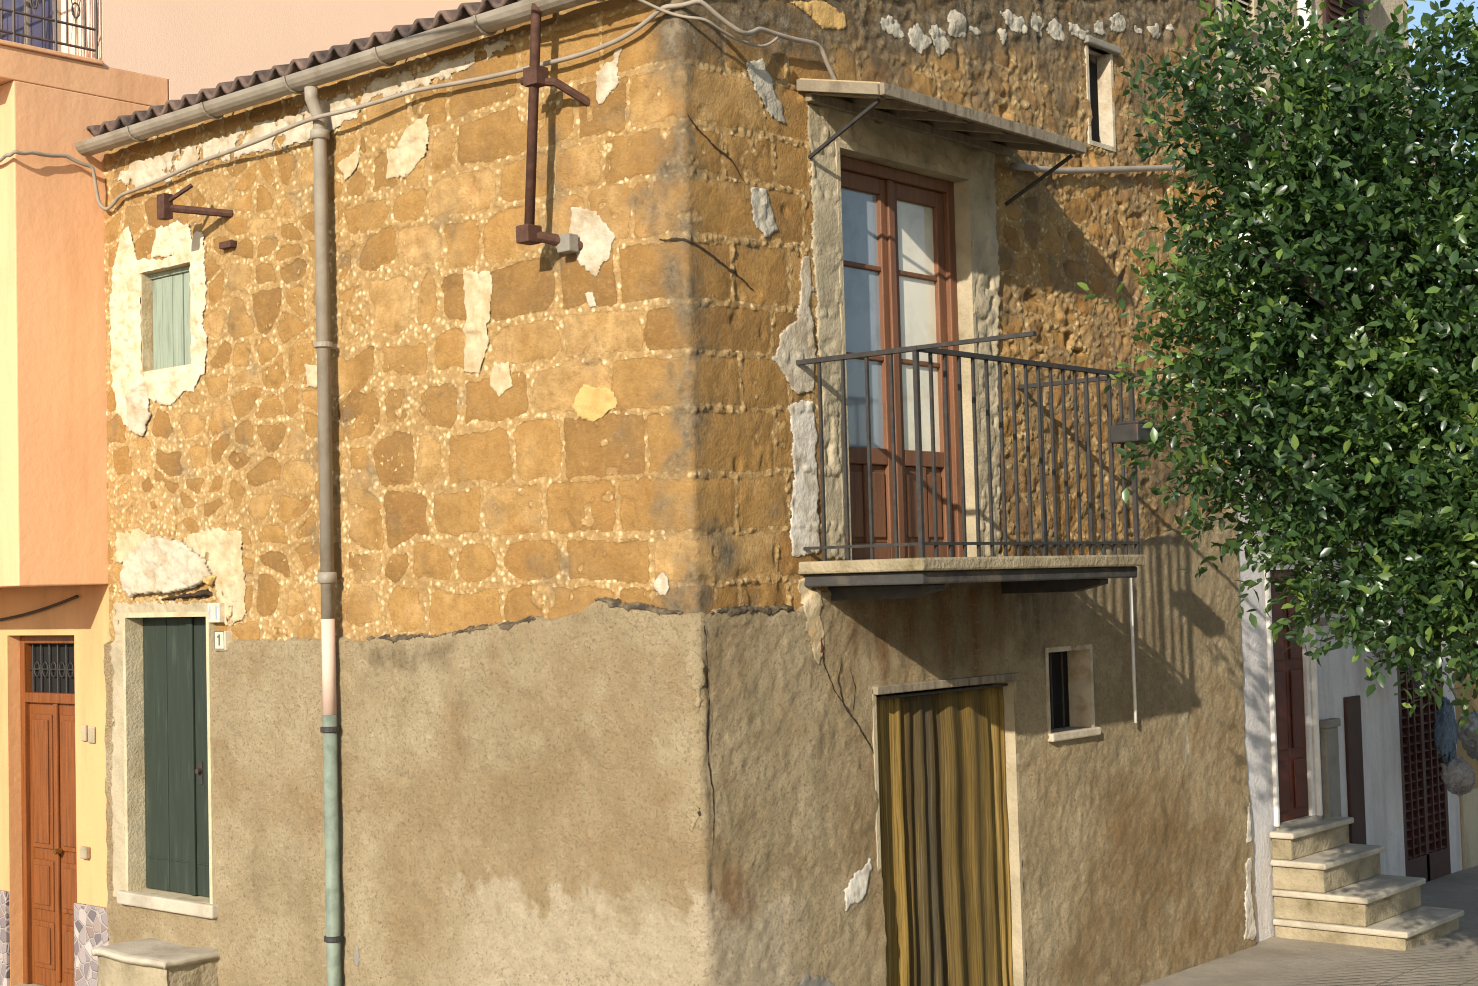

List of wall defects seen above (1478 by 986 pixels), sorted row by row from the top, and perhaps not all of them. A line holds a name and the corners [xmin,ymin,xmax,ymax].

crack [687,114,745,182]
crack [659,238,754,291]
crack [823,651,874,754]